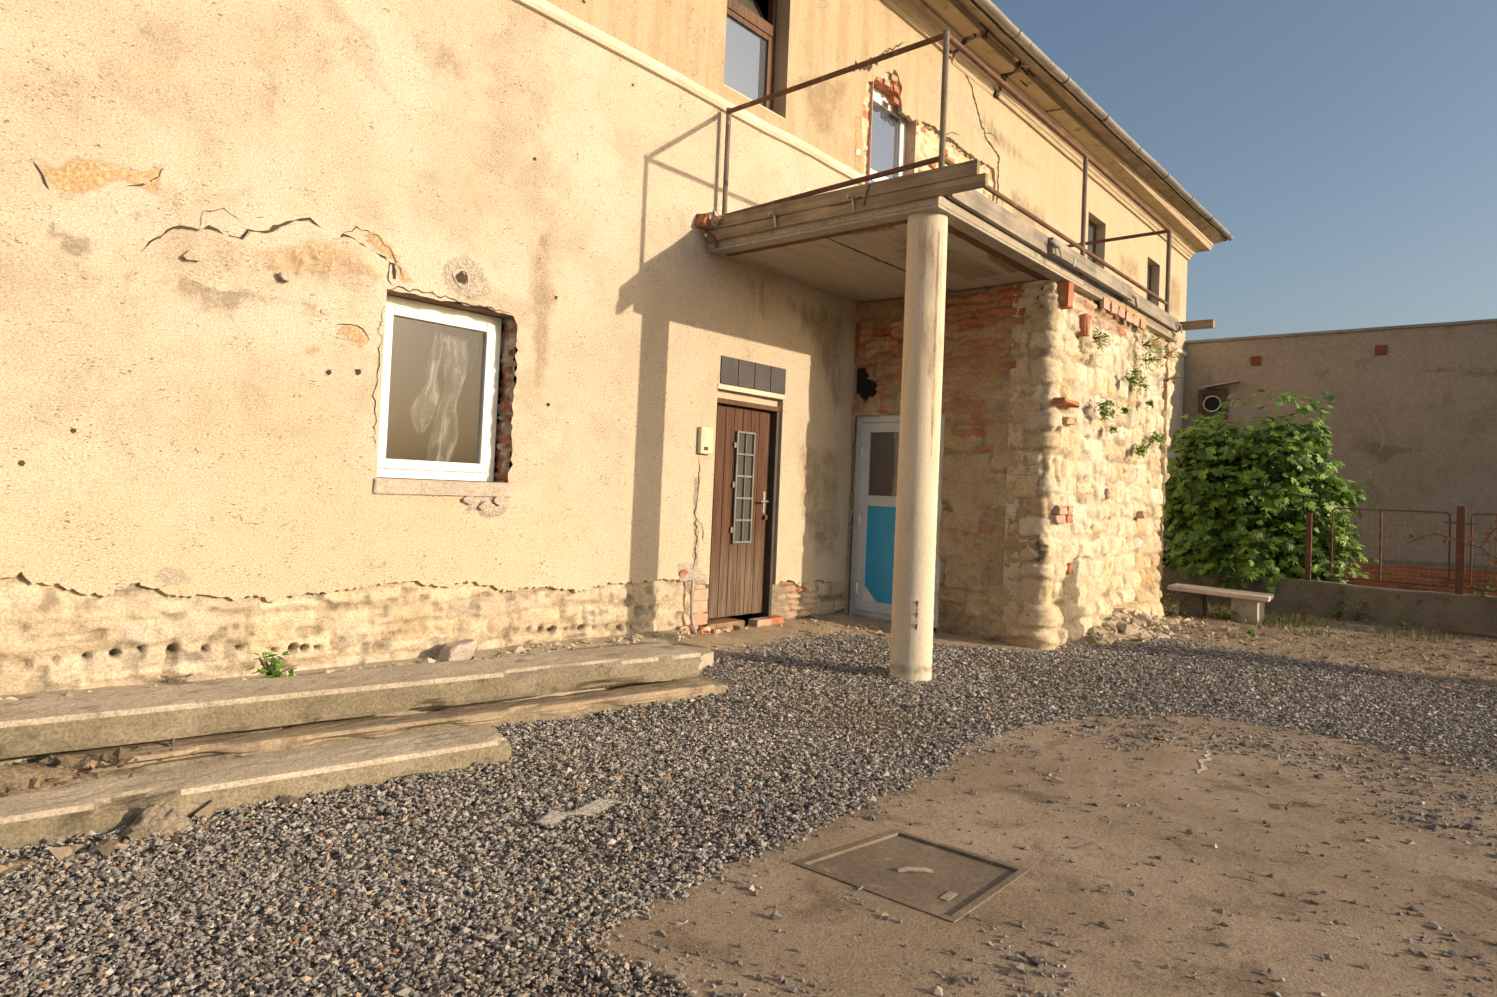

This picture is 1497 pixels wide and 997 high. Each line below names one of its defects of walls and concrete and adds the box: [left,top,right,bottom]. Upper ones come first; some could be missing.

crack [853,42,906,72]
flaking render [29,157,167,200]
flaking render [855,72,899,186]
flaking render [915,123,994,200]
crack [923,29,1064,207]
crack [142,208,509,448]